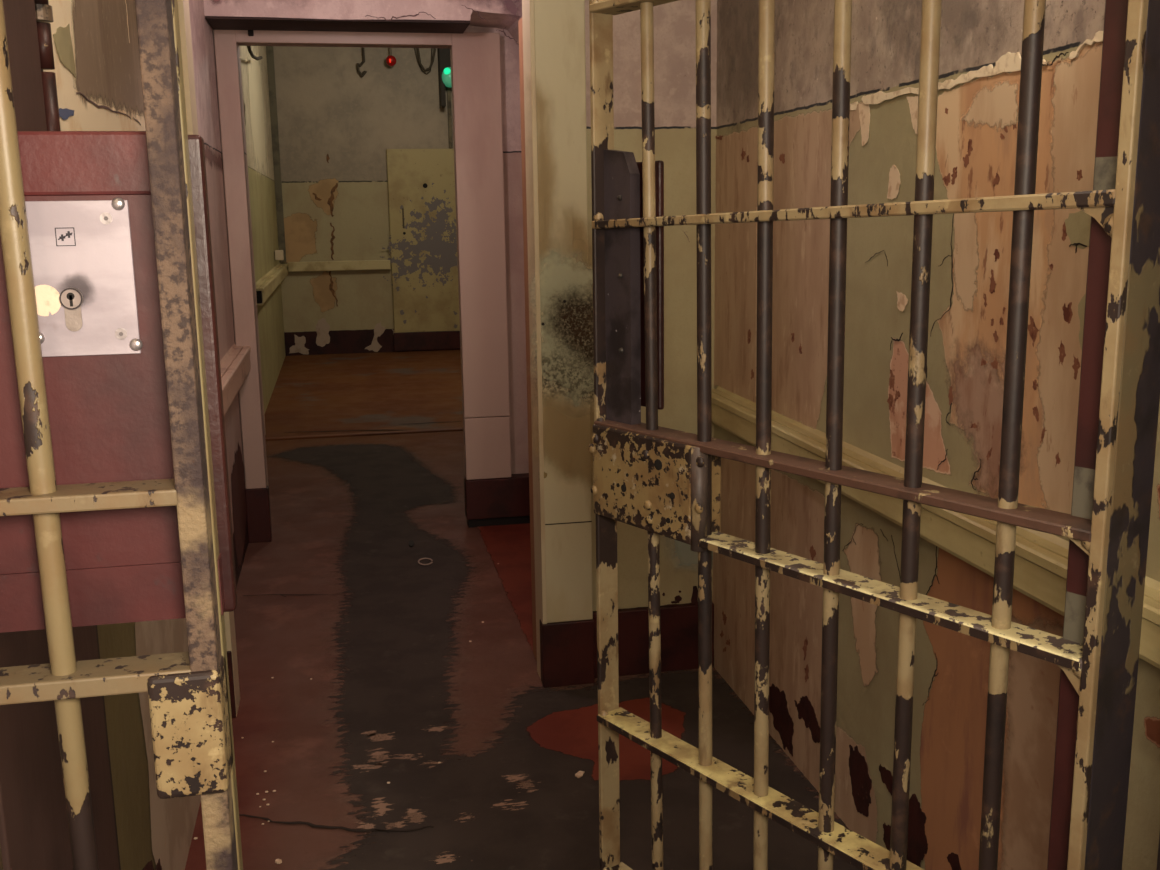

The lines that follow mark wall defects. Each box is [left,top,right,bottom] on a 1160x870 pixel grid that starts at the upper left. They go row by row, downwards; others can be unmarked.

peeling [43,0,146,131]
peeling [936,52,1021,199]
peeling [1035,31,1103,194]
leakage [540,252,594,405]
peeling [772,109,832,430]
peeling [923,211,1013,498]
peeling [1018,208,1091,514]
peeling [270,444,600,870]
peeling [619,767,754,870]
peeling [619,552,755,778]
peeling [920,621,990,870]
peeling [1011,588,1064,637]